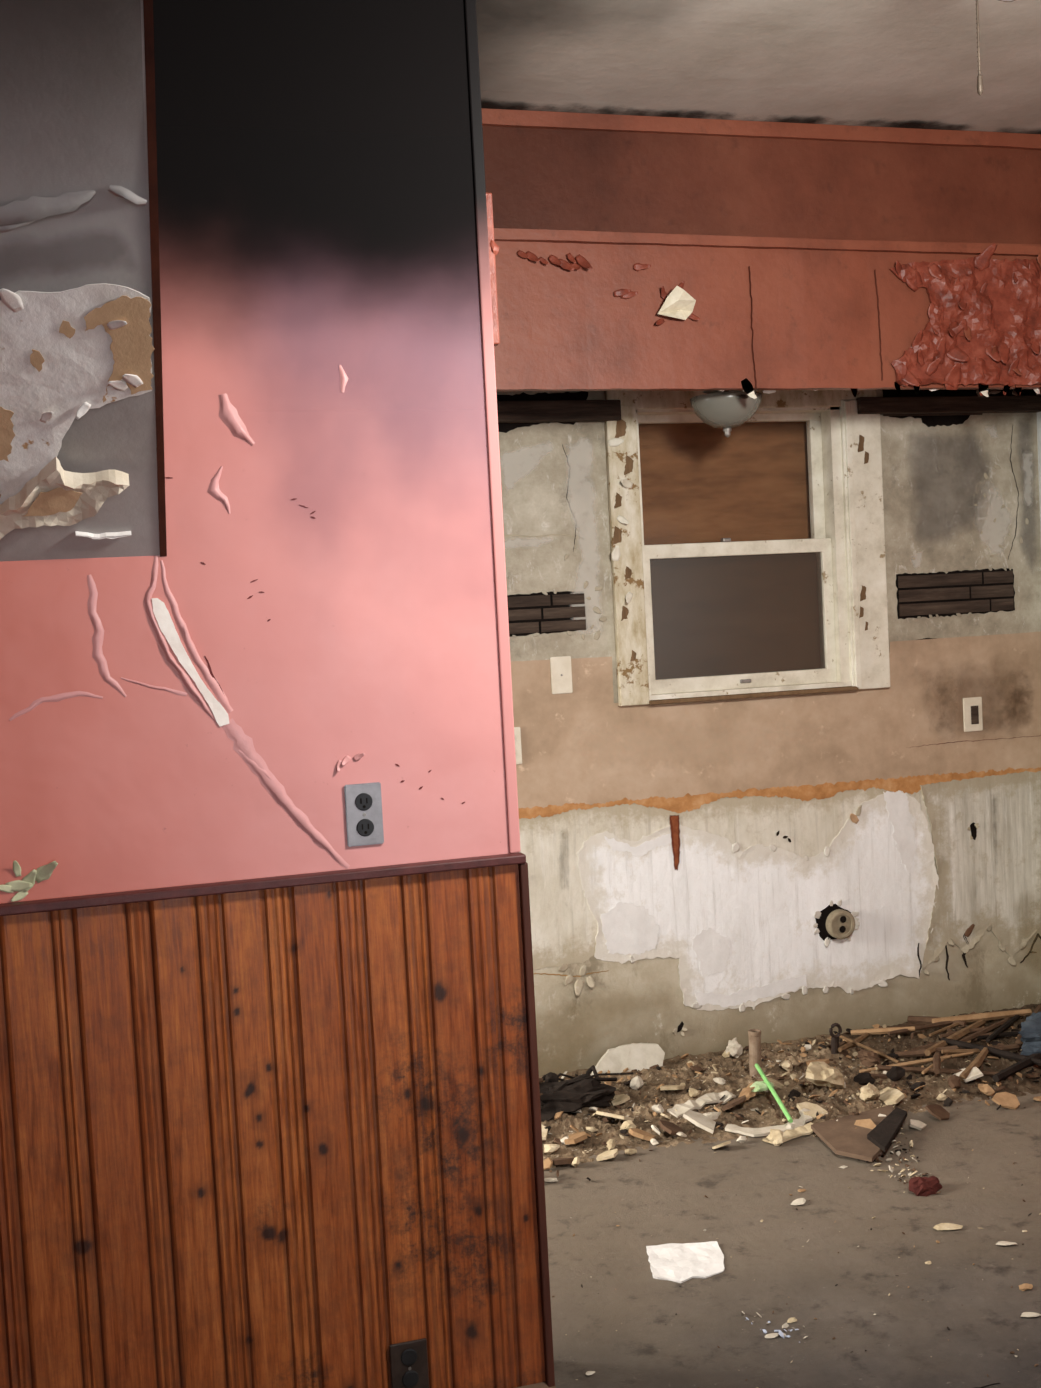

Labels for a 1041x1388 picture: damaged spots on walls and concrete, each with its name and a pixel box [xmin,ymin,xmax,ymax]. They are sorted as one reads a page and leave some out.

peeling [0,283,155,505]
spalling [718,378,776,399]
spalling [894,382,939,394]
spalling [976,383,1041,397]
crack [121,555,350,869]
peeling [519,771,1041,1036]